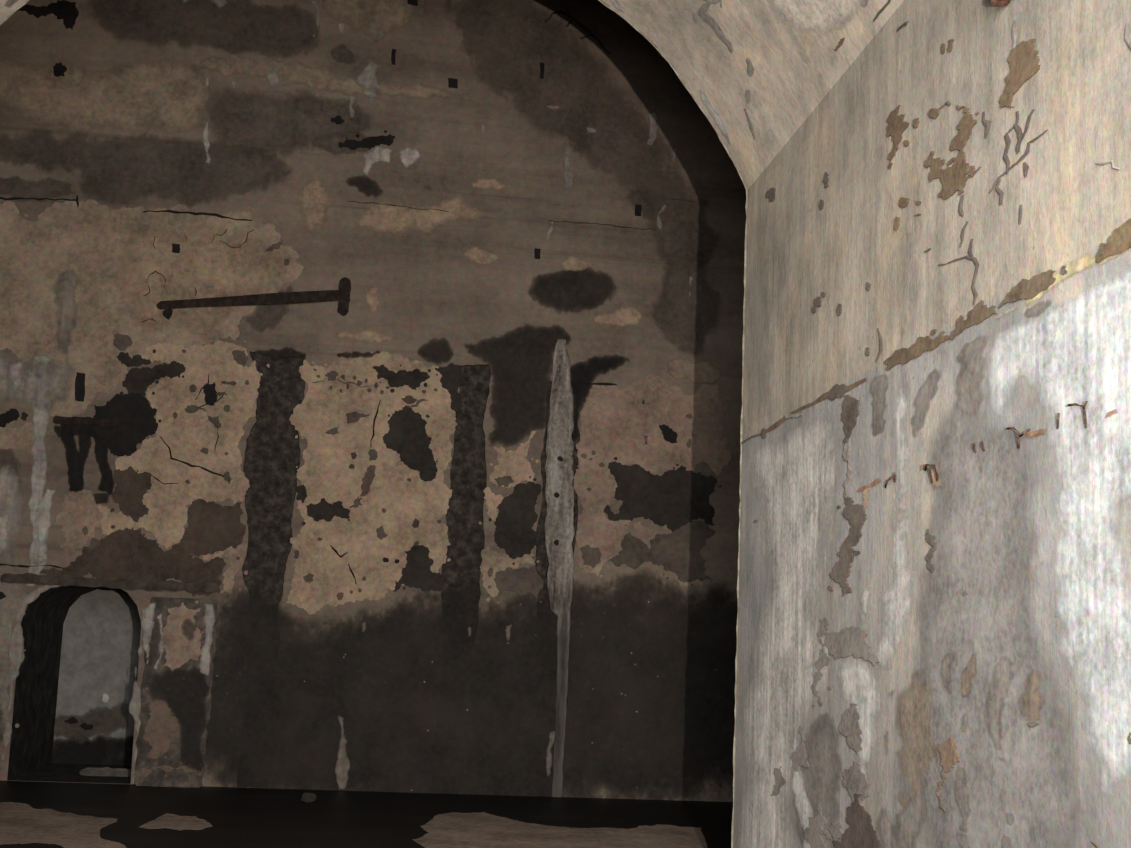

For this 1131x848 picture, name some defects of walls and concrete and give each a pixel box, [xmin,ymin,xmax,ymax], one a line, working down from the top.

crack [0,195,79,207]
leakage [0,0,482,234]
leakage [455,0,722,384]
spalling [924,105,979,200]
crack [924,109,1048,304]
spalling [998,39,1041,108]
spalling [1096,218,1131,263]
spalling [884,266,1067,370]
leakage [0,272,114,761]
leakage [52,252,1131,848]
rust [857,478,881,508]
spalling [803,703,881,848]